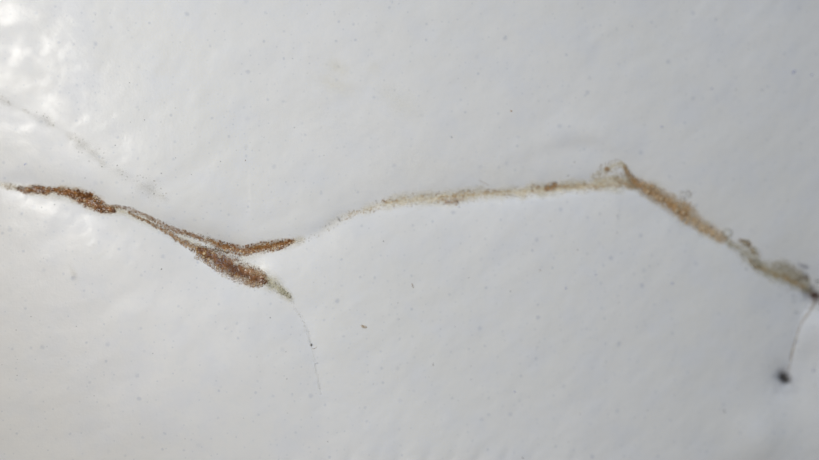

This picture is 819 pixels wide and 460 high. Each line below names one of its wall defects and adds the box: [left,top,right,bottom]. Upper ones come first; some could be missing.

rust [382,160,634,206]
rust [5,185,294,299]